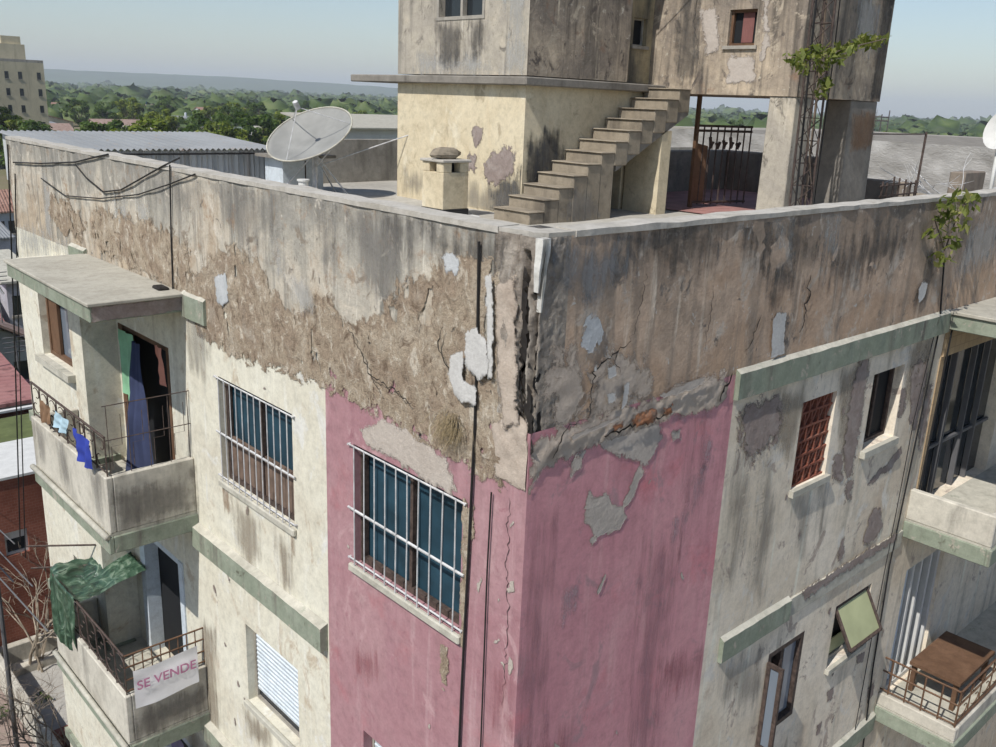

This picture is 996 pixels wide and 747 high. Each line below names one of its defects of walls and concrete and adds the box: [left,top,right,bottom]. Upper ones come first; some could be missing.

water stain [420,22,482,73]
peeling [467,126,517,187]
water stain [743,224,807,305]
flaking render [771,312,787,358]
crack [800,277,811,332]
water stain [825,218,905,274]
flaking render [918,282,928,302]
water stain [915,257,933,304]
flaking render [47,193,729,647]
peeling [735,394,784,466]
peeling [832,359,870,504]
peeling [802,507,897,601]